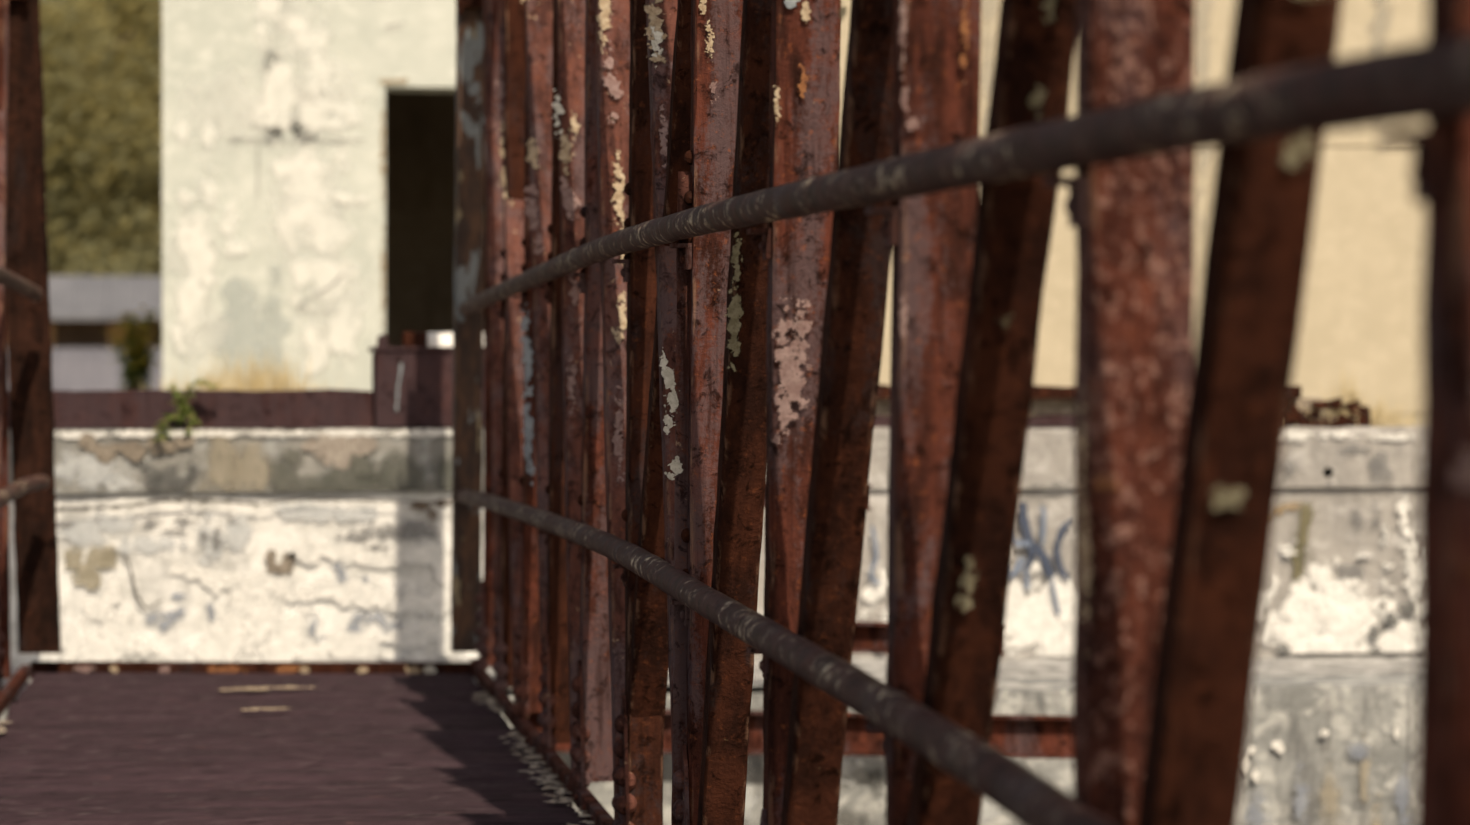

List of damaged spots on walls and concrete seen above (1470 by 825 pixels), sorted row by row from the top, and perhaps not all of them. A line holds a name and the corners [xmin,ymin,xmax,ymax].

peeling [596,0,624,124]
peeling [644,0,668,69]
peeling [698,0,715,58]
peeling [784,0,811,21]
peeling [552,89,581,221]
peeling [610,149,625,230]
peeling [611,291,627,345]
peeling [659,350,679,435]
peeling [771,297,813,444]
corrosion [1287,397,1370,428]
spalling [64,544,119,590]
water stain [54,428,457,662]